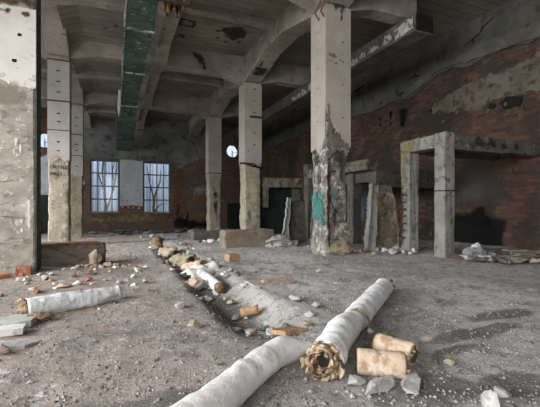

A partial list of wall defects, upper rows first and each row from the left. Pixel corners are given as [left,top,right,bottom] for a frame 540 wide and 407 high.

flaking render [0,0,36,89]
crack [464,16,494,47]
flaking render [239,0,540,211]